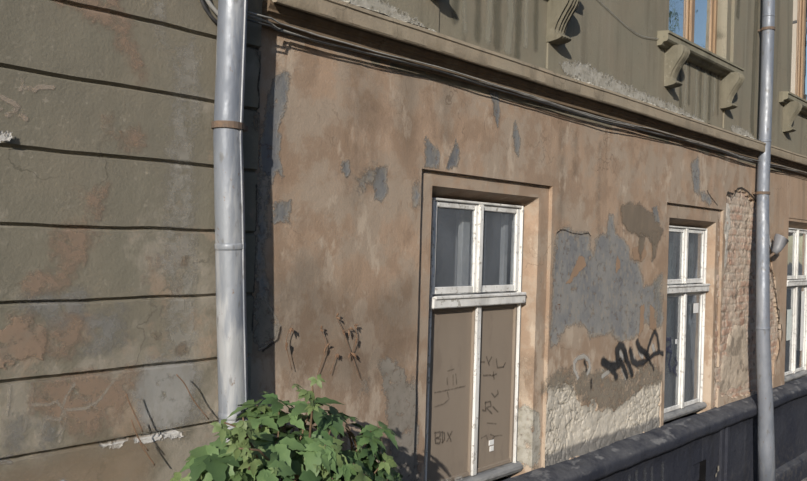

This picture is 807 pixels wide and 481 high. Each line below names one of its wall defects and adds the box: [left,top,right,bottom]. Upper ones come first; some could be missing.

peeling [341,0,437,32]
peeling [559,60,710,124]
peeling [251,46,292,352]
peeling [358,166,388,202]
peeling [424,136,460,170]
peeling [23,227,119,353]
peeling [550,214,664,347]
flaking render [691,157,757,408]
peeling [29,343,198,450]
spalling [516,380,661,468]